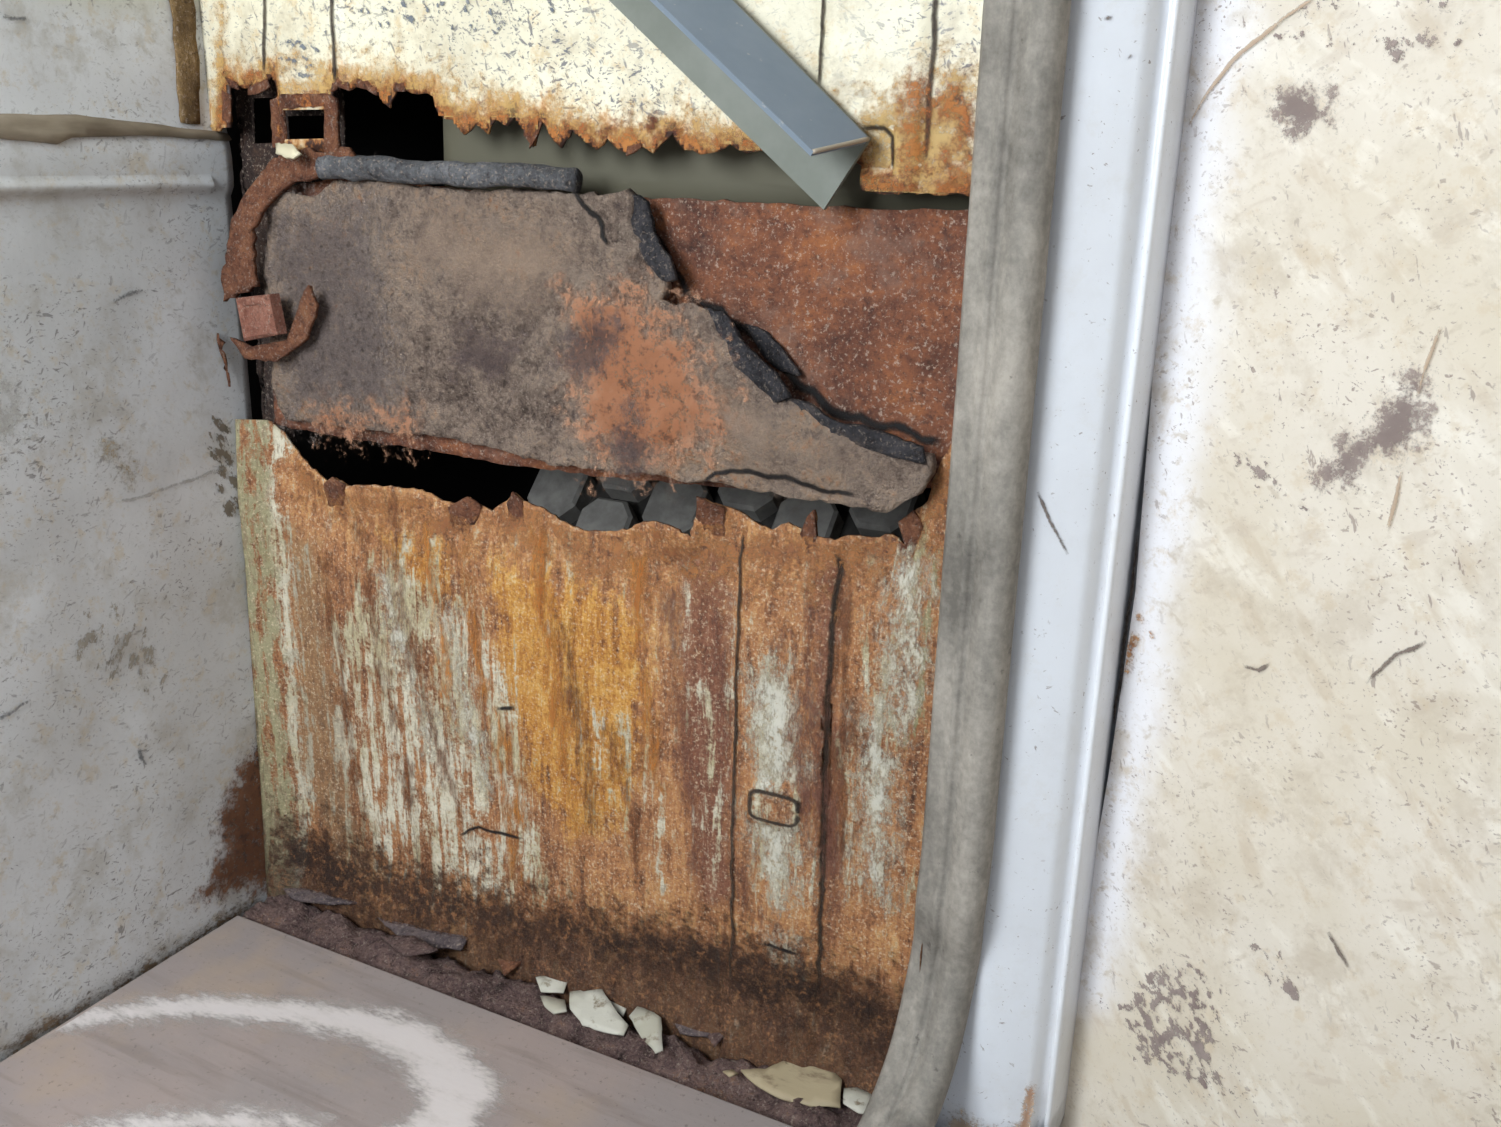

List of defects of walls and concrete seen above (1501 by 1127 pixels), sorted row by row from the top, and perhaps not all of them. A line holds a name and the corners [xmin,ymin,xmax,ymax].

peeling [275,143,302,160]
corrosion [210,2,762,154]
corrosion [857,45,978,194]
crack [573,192,938,464]
crack [705,469,853,496]
corrosion [3,458,950,1070]